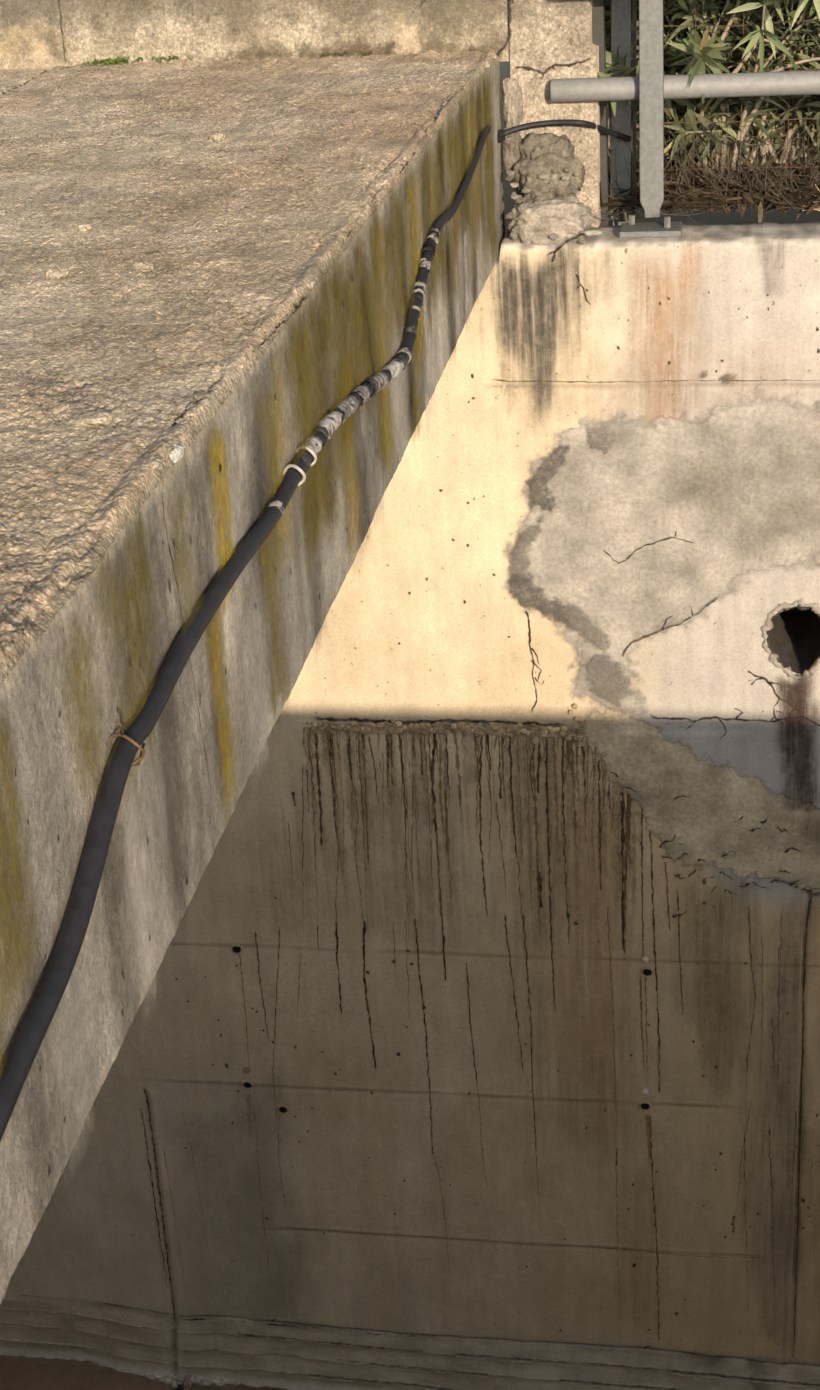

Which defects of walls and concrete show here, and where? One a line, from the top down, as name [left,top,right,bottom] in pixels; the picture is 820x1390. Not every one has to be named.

damp [499,251,579,403]
damp [247,83,496,760]
damp [203,431,233,568]
crack [604,532,692,564]
damp [209,586,233,799]
crack [623,598,717,656]
crack [653,671,820,738]
peeling [659,835,817,910]
peeling [733,816,801,853]
damp [288,727,694,1247]
damp [715,900,801,1294]
corrosion [646,1115,660,1340]